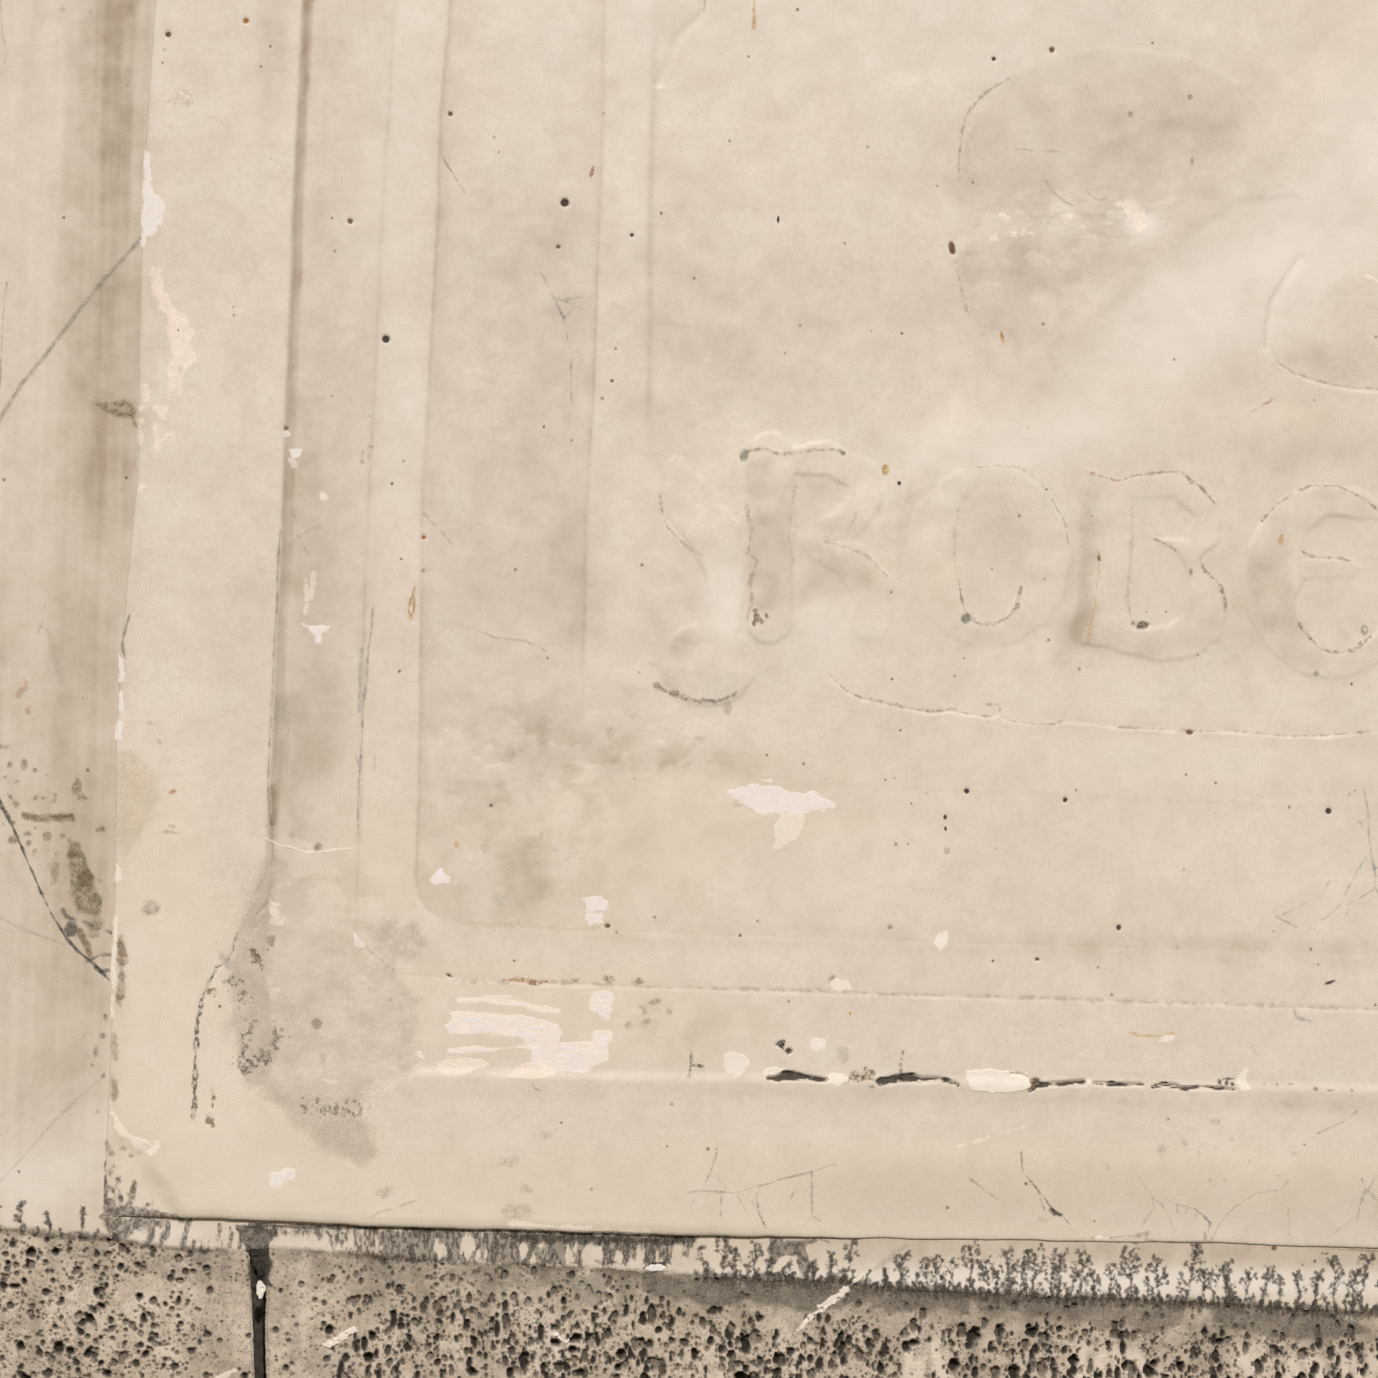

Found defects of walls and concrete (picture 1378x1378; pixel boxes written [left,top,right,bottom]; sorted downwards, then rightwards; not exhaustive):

peeling [141,152,165,247]
peeling [137,268,195,451]
damp [22,812,75,822]
crack [0,799,111,981]
peeling [763,1067,784,1075]
peeling [828,1073,848,1087]
peeling [1236,1068,1250,1091]
damp [99,1161,1187,1334]
damp [1211,1304,1370,1341]